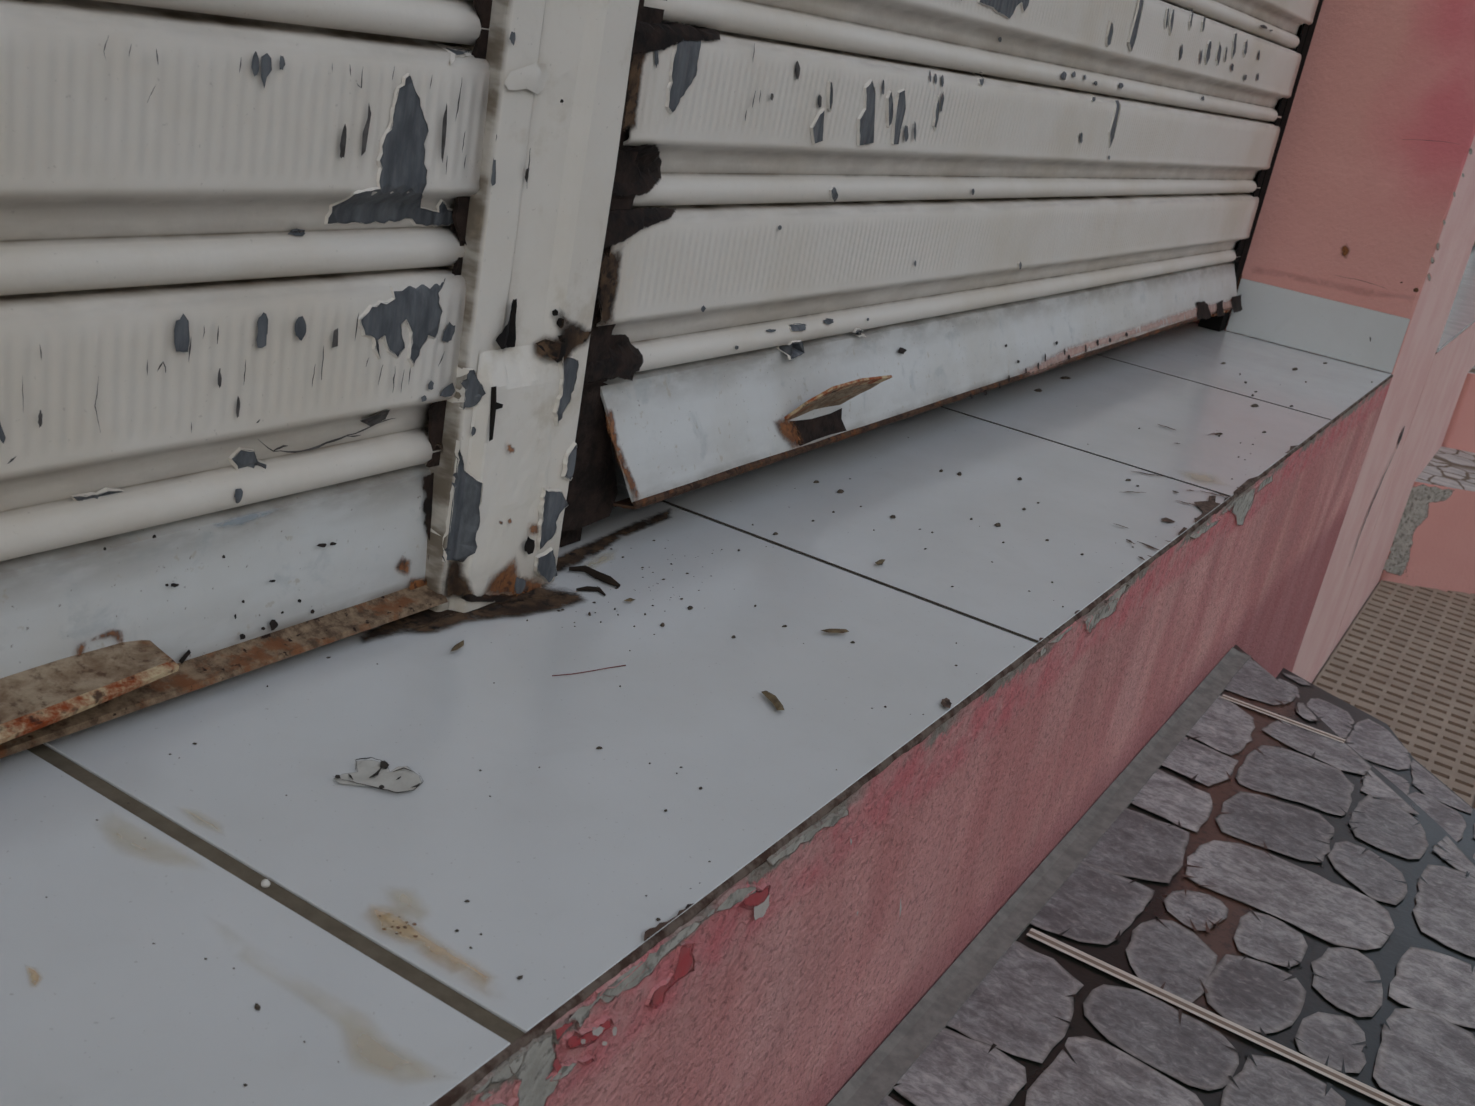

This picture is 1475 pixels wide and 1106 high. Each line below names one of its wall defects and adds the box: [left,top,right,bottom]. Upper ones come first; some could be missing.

peeling [977,0,1029,19]
peeling [1061,71,1097,102]
peeling [324,73,454,227]
peeling [358,278,455,367]
peeling [421,367,486,410]
peeling [552,356,579,426]
rust [777,419,800,446]
peeling [430,427,483,563]
peeling [514,442,577,594]
rust [77,630,123,656]
rust [234,599,315,640]
spalling [471,806,849,1106]